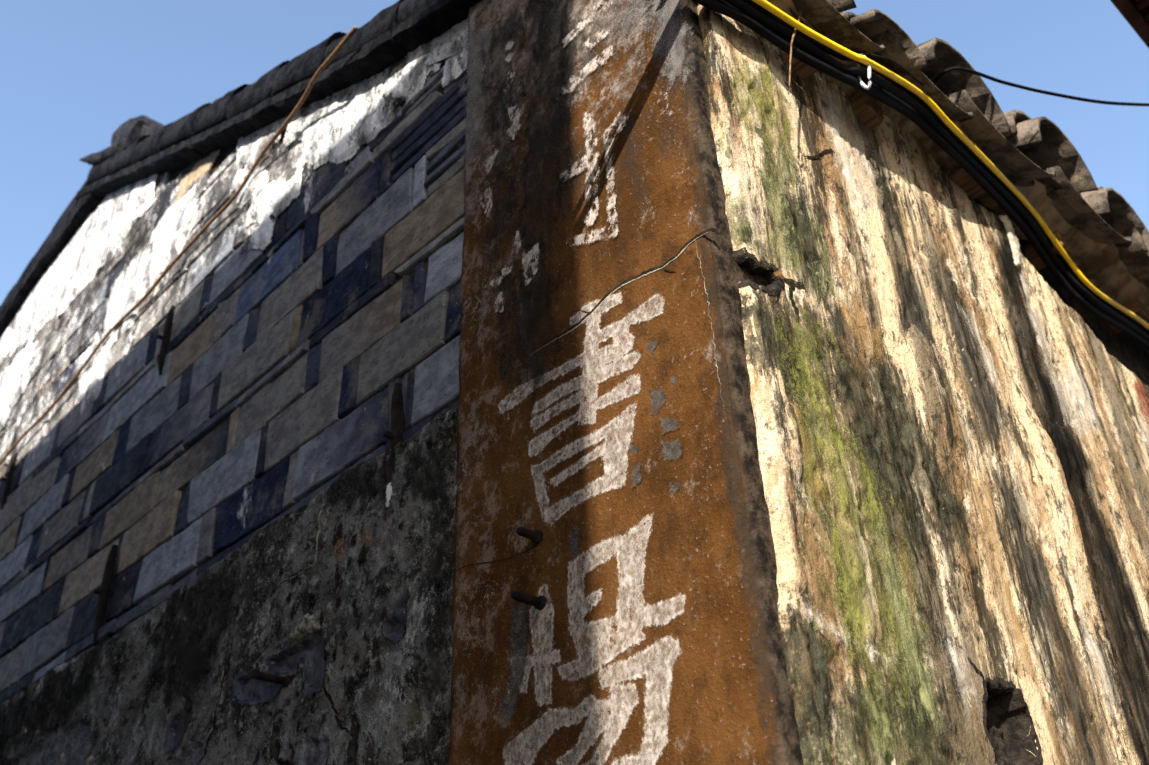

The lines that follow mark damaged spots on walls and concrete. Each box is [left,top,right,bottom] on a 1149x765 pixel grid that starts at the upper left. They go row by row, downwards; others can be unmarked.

peeling [613,0,694,90]
flaking render [231,18,490,251]
damp [713,53,1149,765]
rust [379,455,393,522]
damp [0,554,118,765]
damp [148,553,241,714]
flaking render [232,521,368,713]
flaking render [372,584,412,676]
flaking render [253,721,329,765]
spalling [347,714,377,765]
flaking render [982,676,1044,765]